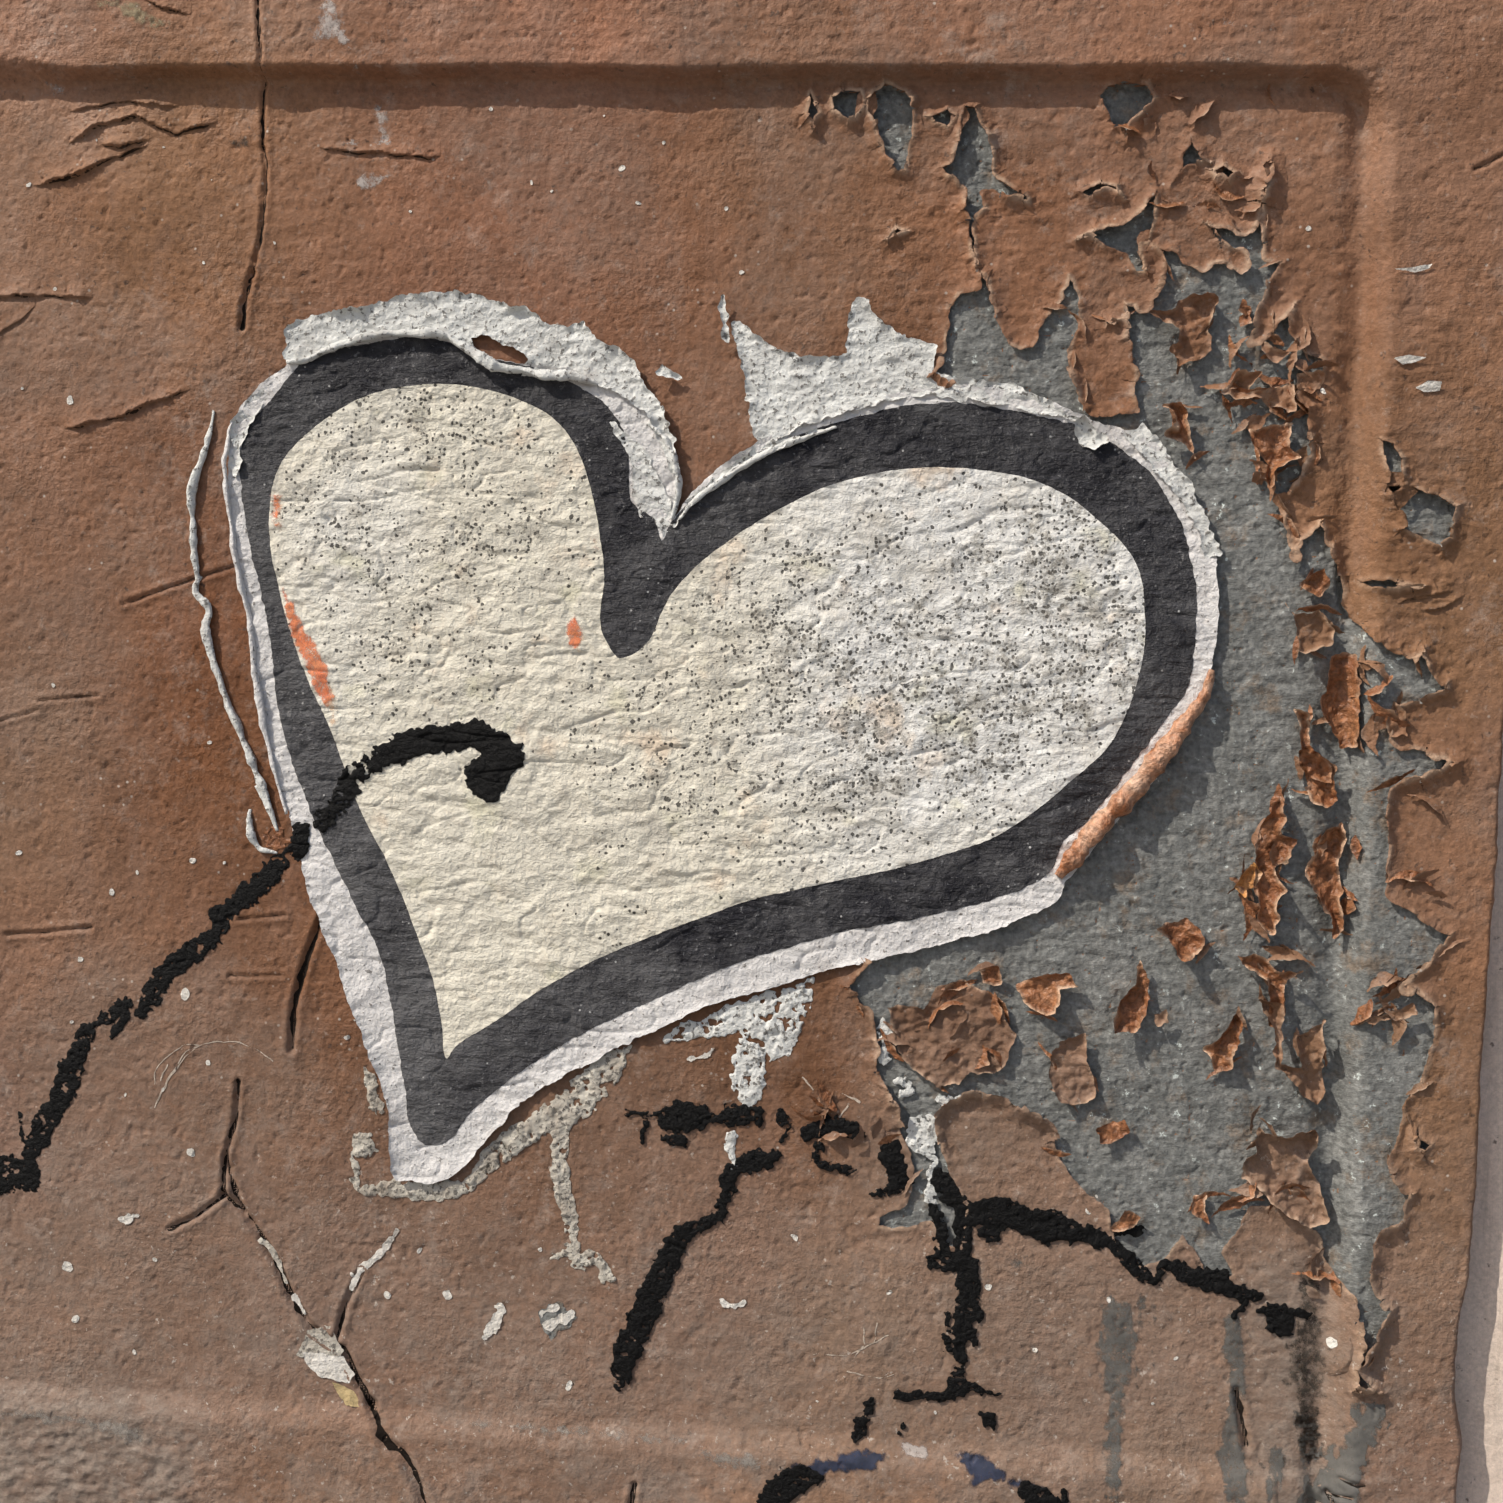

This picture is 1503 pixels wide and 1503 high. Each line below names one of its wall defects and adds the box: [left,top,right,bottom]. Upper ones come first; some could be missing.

crack [240,0,268,331]
peeling [791,62,1474,1408]
crack [290,922,320,1049]
peeling [687,1048,713,1062]
crack [167,1079,426,1503]
water stain [1095,1296,1157,1503]
water stain [1216,1264,1391,1503]